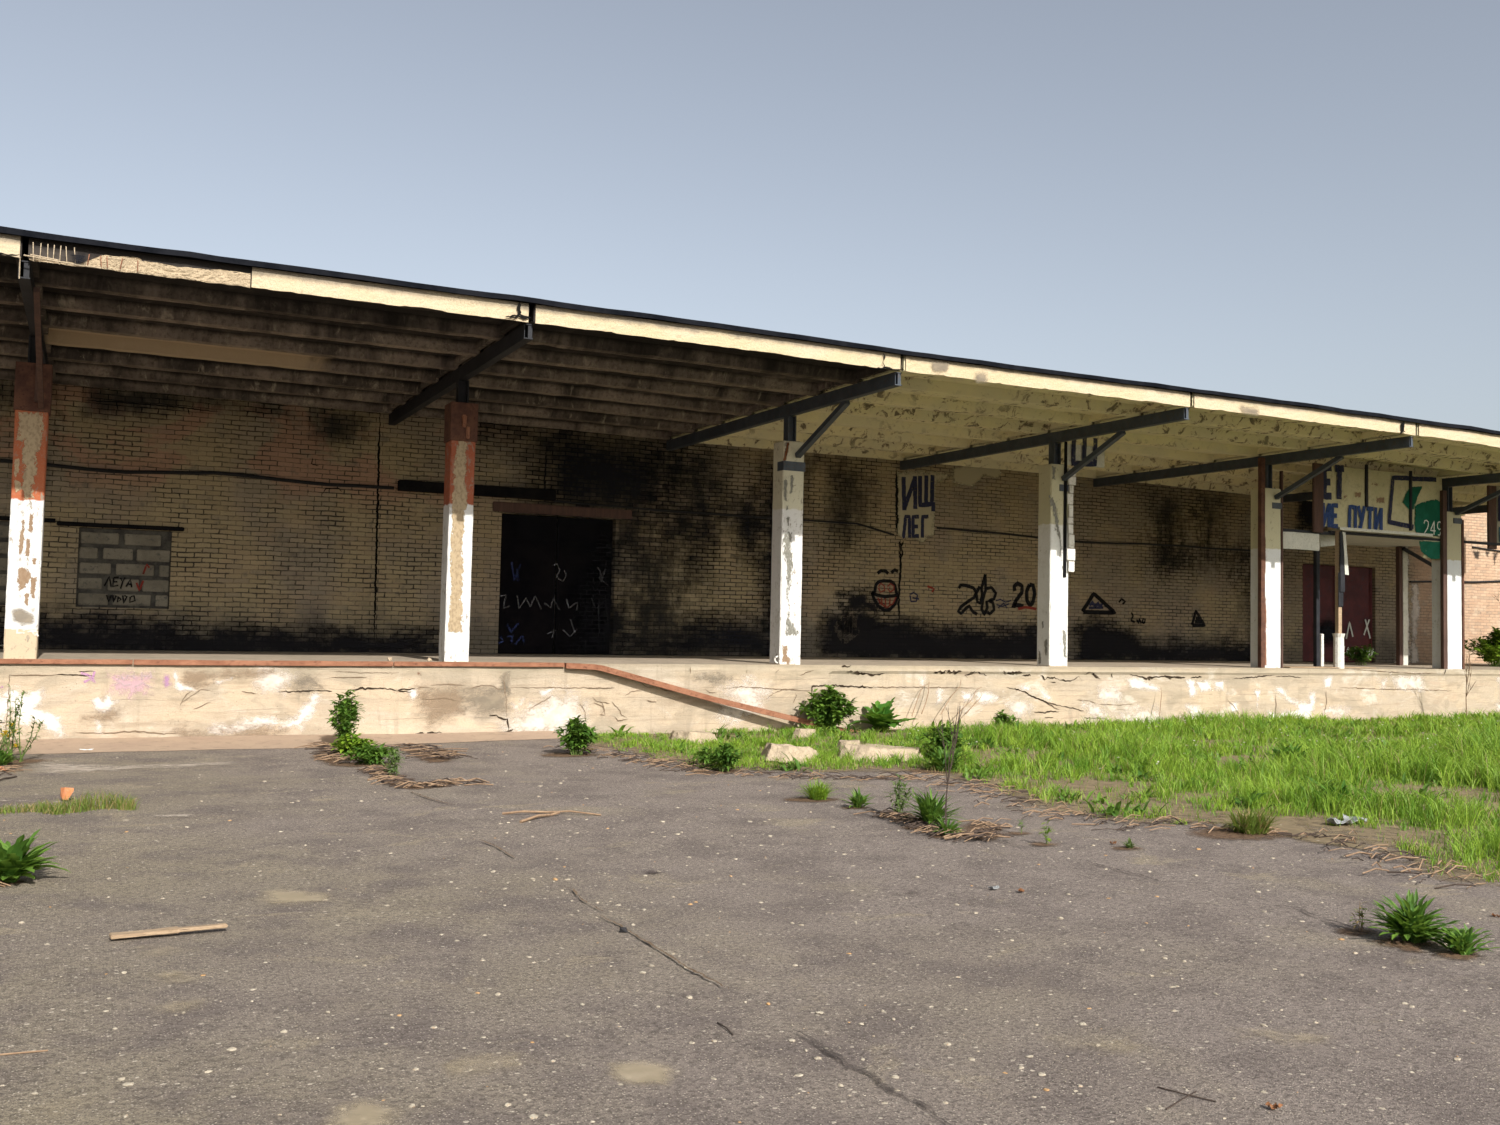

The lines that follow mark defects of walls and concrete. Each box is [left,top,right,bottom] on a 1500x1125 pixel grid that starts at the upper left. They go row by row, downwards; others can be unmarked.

spalling [24,242,251,288]
peeling [14,412,44,605]
damp [0,606,440,737]
peeling [448,441,468,633]
damp [582,603,770,657]
damp [662,445,768,590]
peeling [782,475,799,665]